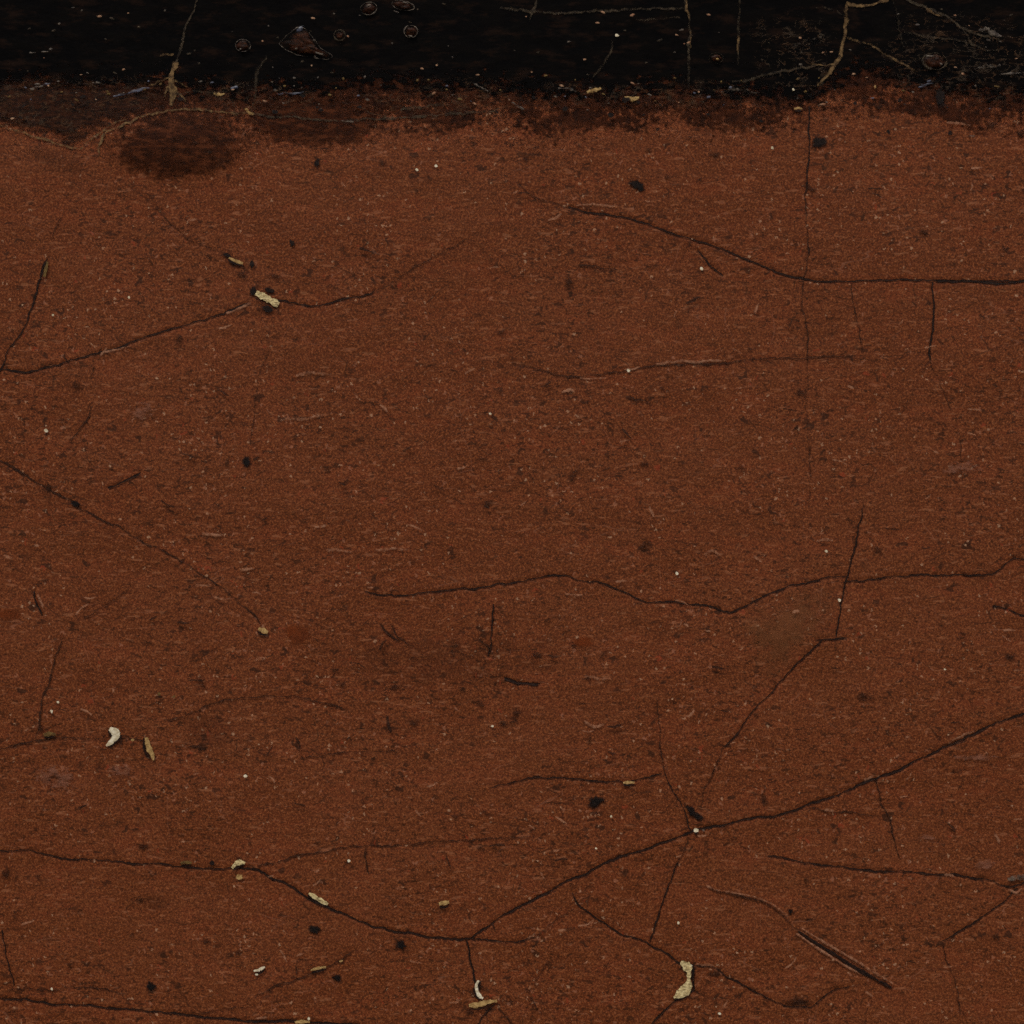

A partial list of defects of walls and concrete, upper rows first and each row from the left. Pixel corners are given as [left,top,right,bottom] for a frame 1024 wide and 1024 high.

crack [0,207,256,379]
crack [277,239,466,307]
damp [0,67,1024,179]
crack [506,0,1024,406]
crack [0,460,261,624]
crack [0,508,1024,1024]